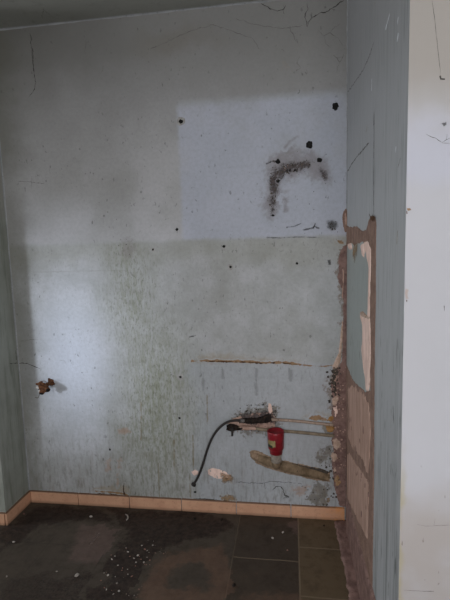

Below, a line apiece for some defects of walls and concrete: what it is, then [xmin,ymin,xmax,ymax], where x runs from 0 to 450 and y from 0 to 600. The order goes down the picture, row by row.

mould [249,133,343,234]
spalling [219,397,288,443]
spalling [319,209,377,600]
peeling [208,468,233,484]
water stain [284,480,335,507]
water stain [309,439,334,472]